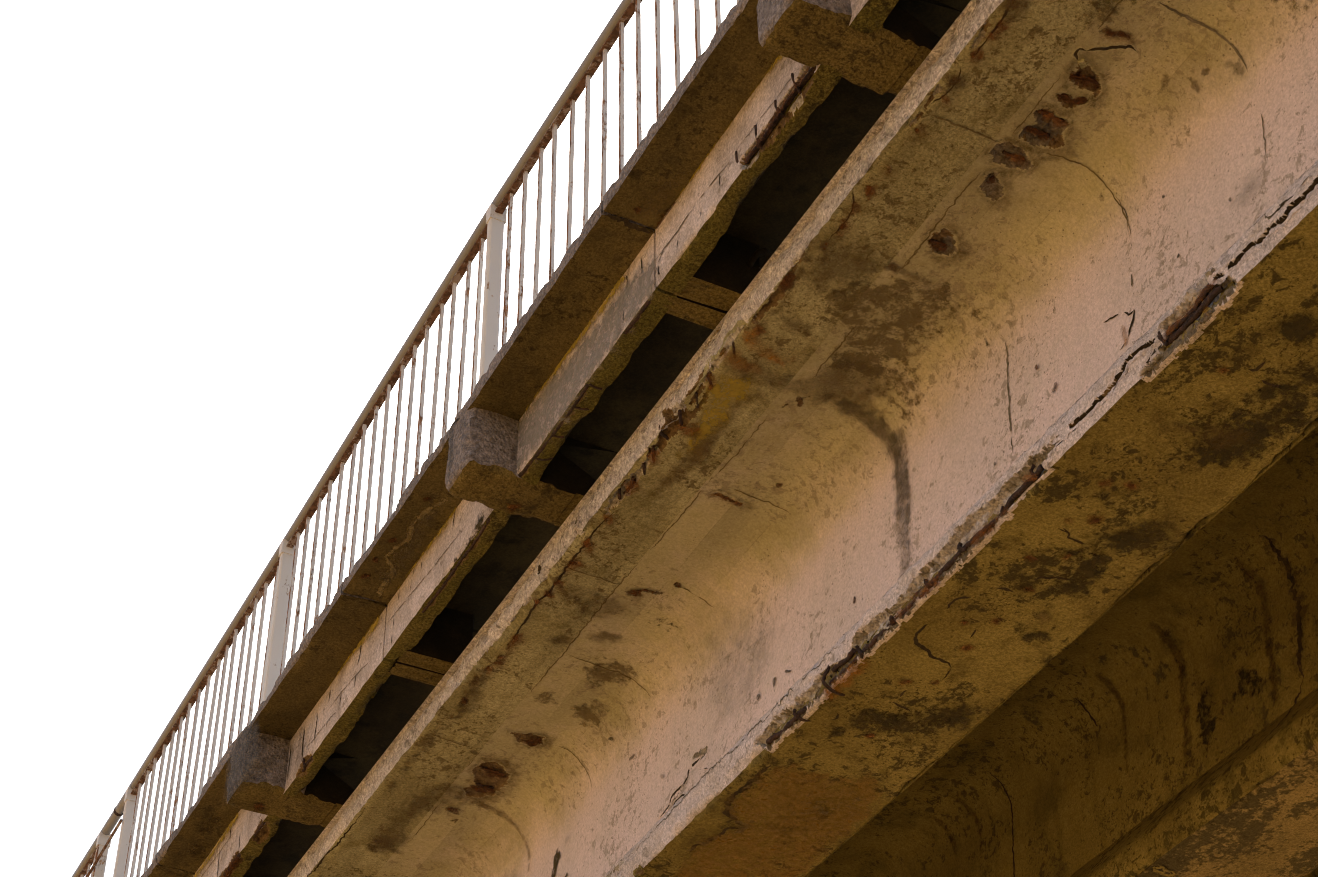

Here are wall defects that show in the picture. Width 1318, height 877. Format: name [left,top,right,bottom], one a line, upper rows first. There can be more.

spalling [735,64,821,175]
crack [930,0,1136,143]
rust [1105,28,1132,40]
crack [1159,2,1247,69]
crack [830,192,855,239]
crack [896,172,981,275]
spalling [922,225,966,260]
crack [1004,152,1166,467]
spalling [1133,261,1244,383]
crack [511,419,790,697]
spalling [752,425,1070,753]
crack [1255,535,1304,749]